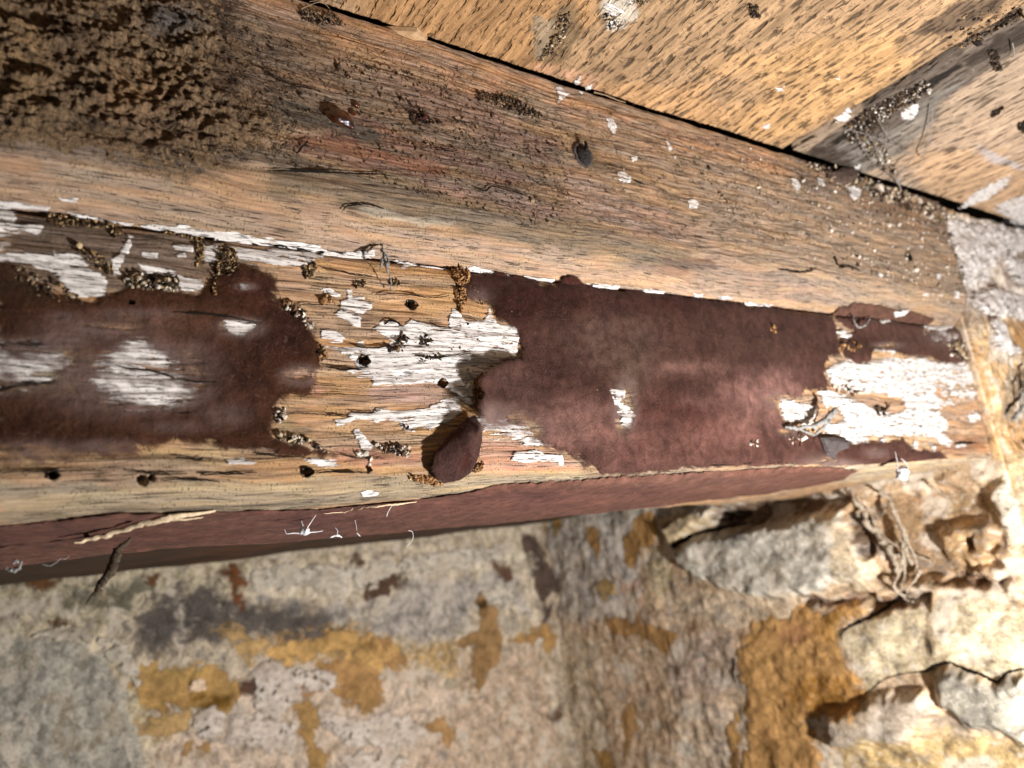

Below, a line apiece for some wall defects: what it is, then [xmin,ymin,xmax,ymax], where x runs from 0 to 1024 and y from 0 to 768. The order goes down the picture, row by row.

peeling [0,197,375,298]
peeling [464,266,510,277]
peeling [0,340,72,391]
peeling [90,336,197,411]
peeling [223,320,257,336]
peeling [321,288,564,466]
peeling [779,349,981,459]
peeling [303,458,339,468]
spalling [598,577,678,656]
crack [839,591,907,637]
spalling [726,598,868,768]
crack [866,639,1024,694]